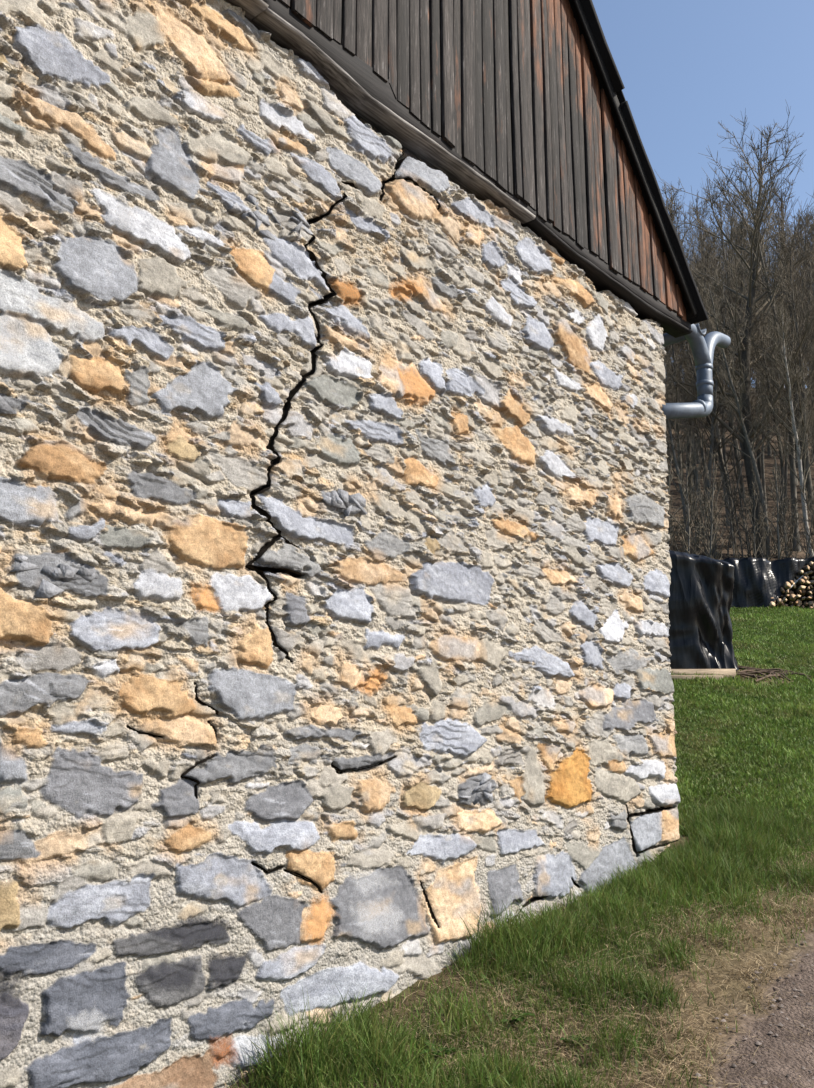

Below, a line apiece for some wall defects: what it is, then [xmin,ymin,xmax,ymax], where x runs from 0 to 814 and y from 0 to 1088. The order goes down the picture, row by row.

crack [245,152,441,662]
crack [126,725,164,738]
crack [180,683,219,799]
crack [625,805,678,857]
crack [251,862,322,893]